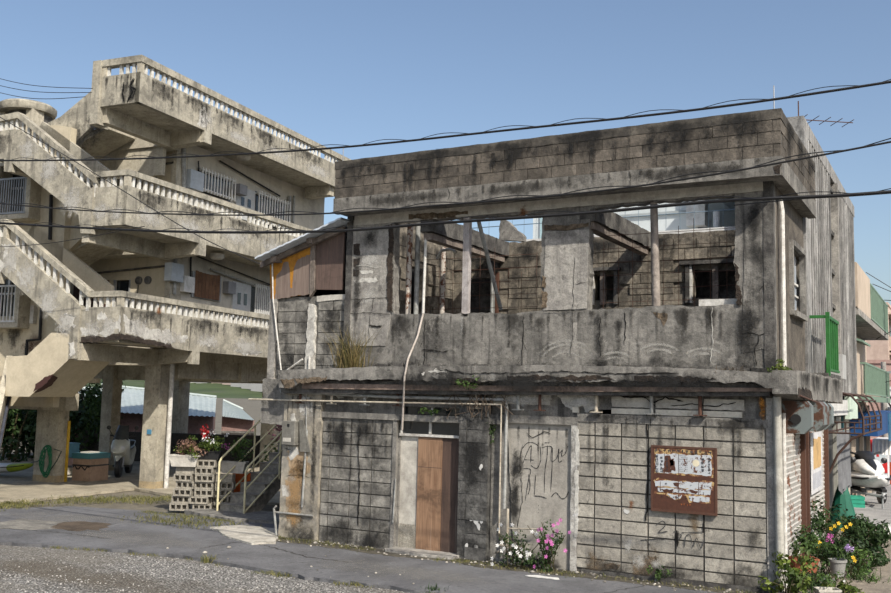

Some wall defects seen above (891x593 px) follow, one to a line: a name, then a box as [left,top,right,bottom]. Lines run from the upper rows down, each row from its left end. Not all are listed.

damp [488,141,537,165]
damp [565,130,606,162]
damp [649,122,692,150]
damp [370,149,448,204]
damp [482,180,541,194]
damp [640,163,739,179]
peeling [0,244,27,286]
peeling [64,312,188,357]
crack [741,332,764,365]
damp [328,421,387,450]
peeling [282,445,311,509]
damp [325,522,383,547]